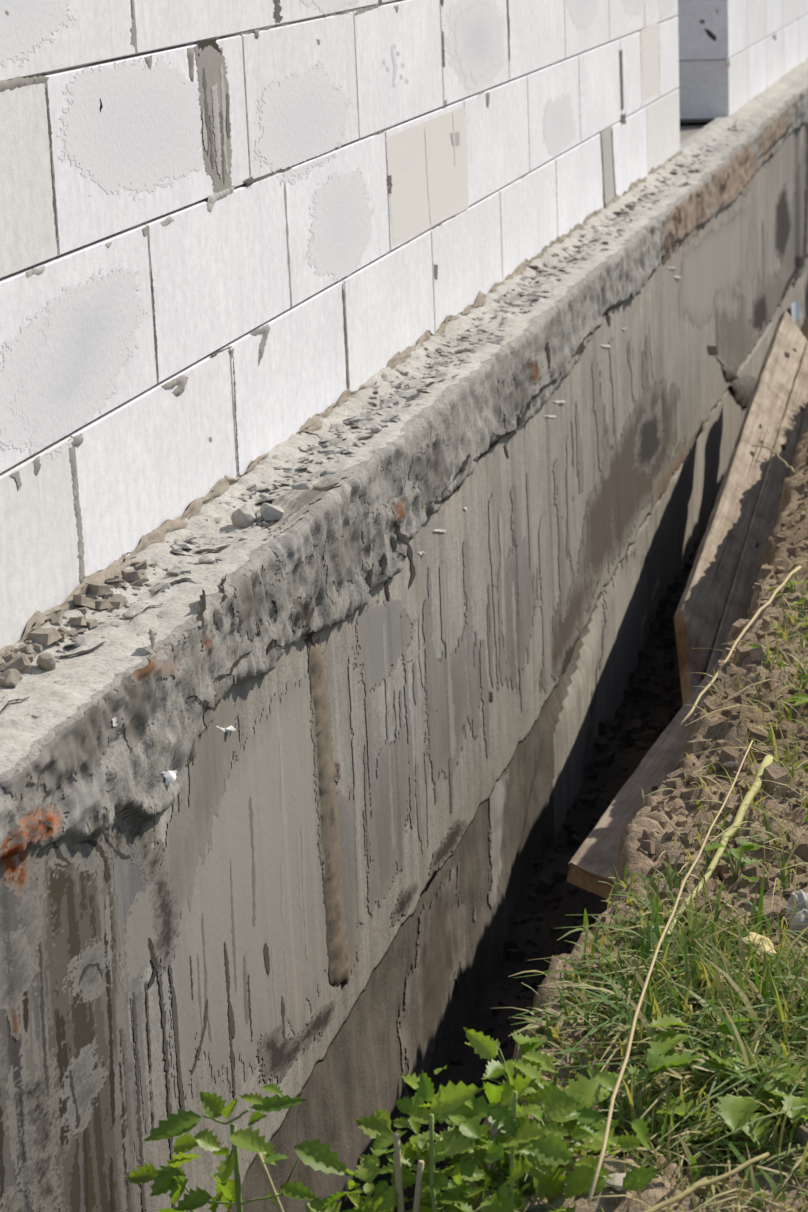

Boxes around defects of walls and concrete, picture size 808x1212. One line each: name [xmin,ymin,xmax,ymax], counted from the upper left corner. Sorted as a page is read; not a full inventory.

leakage [679,127,808,383]
leakage [0,264,148,459]
crack [432,260,662,503]
crack [59,641,106,657]
crack [130,544,231,628]
crack [254,519,279,527]
crack [185,522,416,748]
leakage [336,322,666,973]
corrosion [0,803,65,897]
leakage [0,673,329,1212]
crack [322,865,332,983]